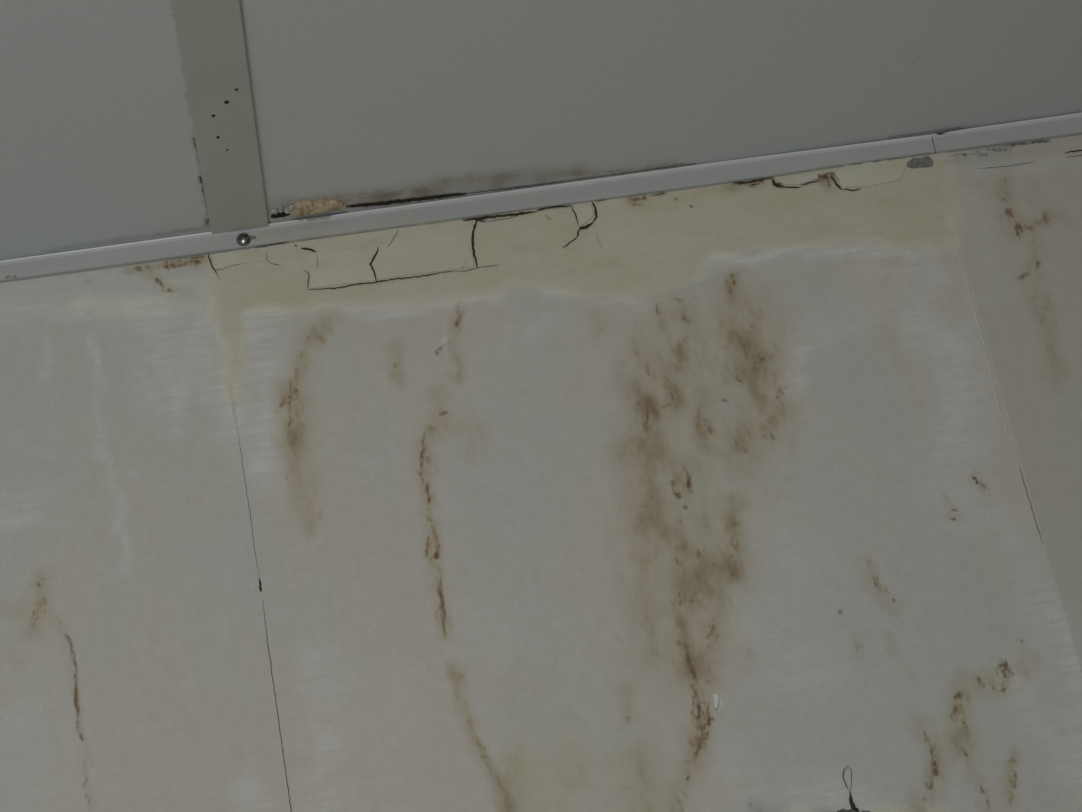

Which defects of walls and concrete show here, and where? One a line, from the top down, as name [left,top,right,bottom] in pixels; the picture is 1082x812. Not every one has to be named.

crack [208,163,696,290]
crack [734,176,858,191]
rust [636,387,663,467]
rust [637,481,742,605]
rust [68,636,79,713]
rust [675,616,713,760]